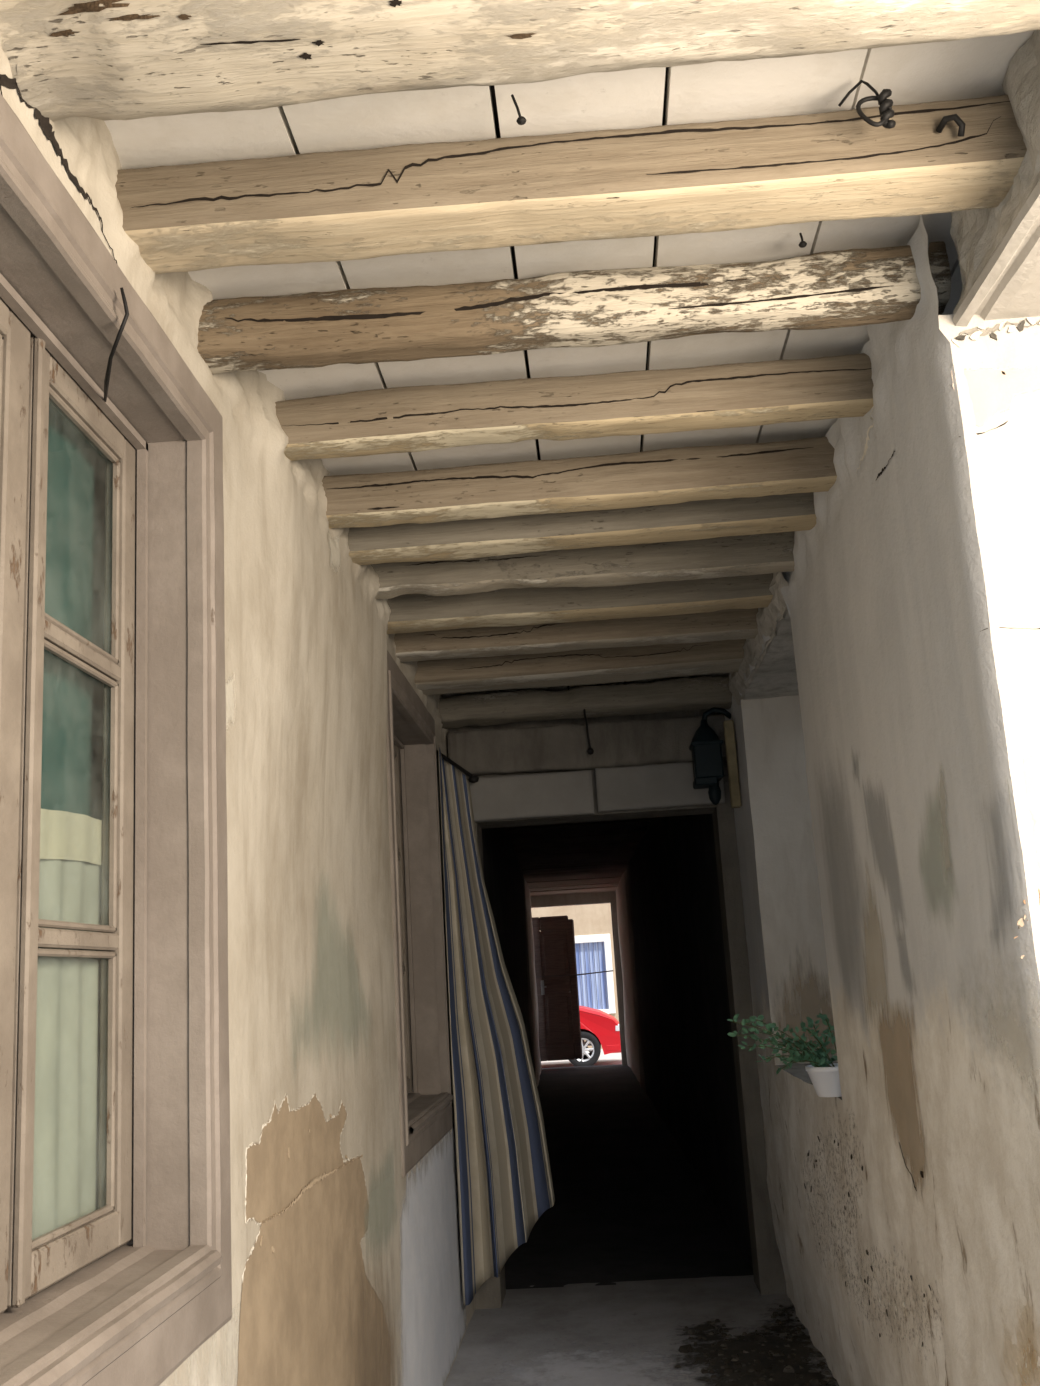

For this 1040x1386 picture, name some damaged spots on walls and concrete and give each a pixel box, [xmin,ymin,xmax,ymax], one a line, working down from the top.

crack [0,65,118,265]
flaking render [237,1092,394,1386]